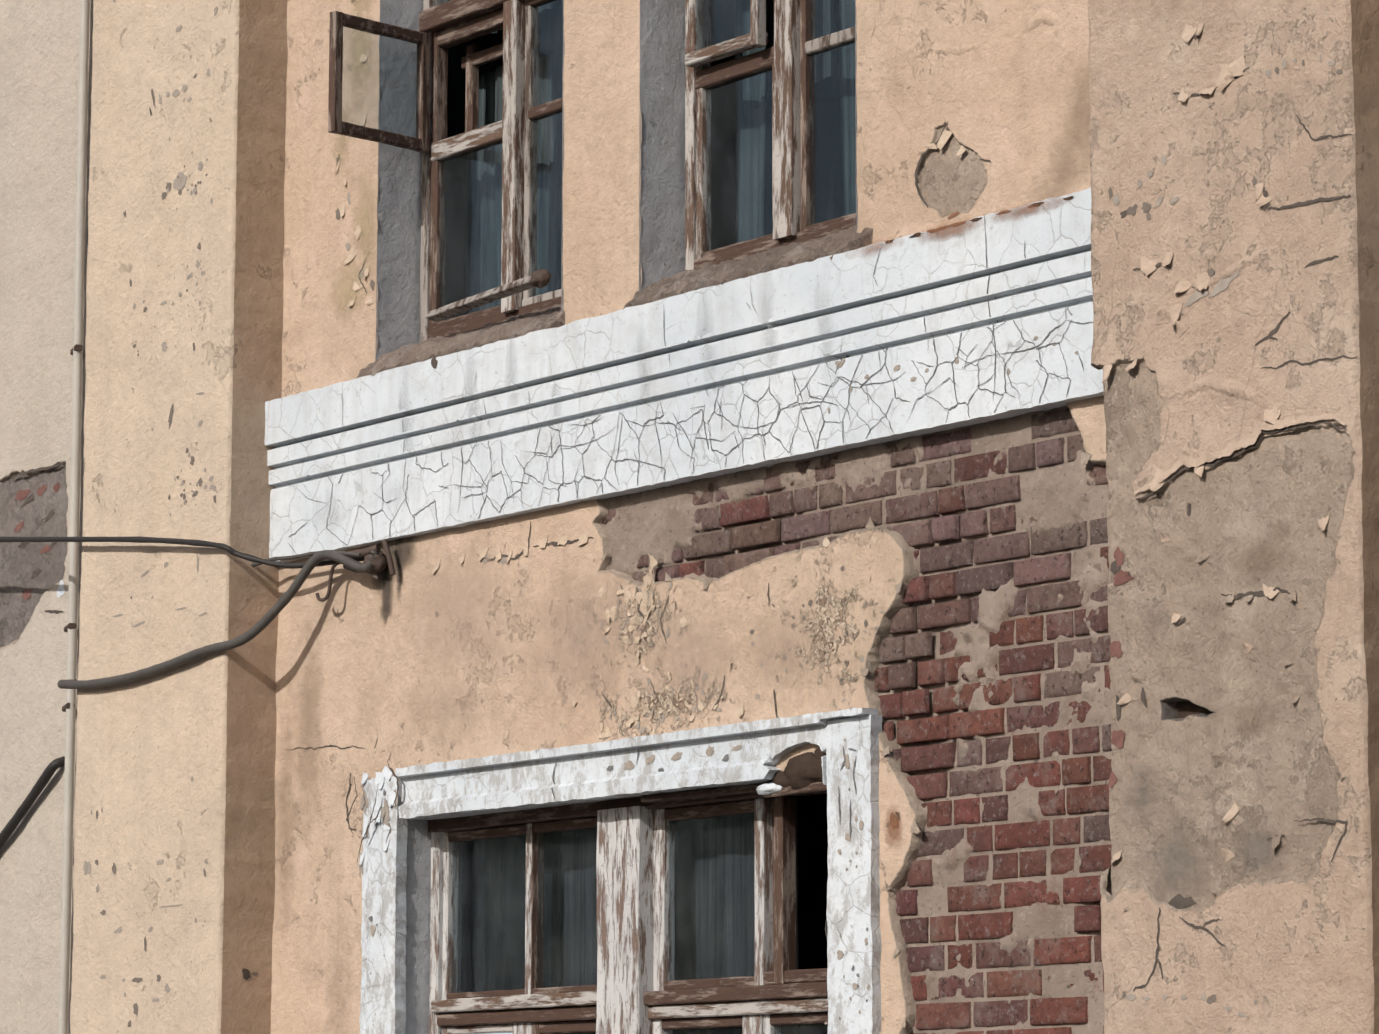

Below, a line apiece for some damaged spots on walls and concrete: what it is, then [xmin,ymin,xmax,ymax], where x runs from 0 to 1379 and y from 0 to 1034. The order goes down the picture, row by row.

peeling [1181,22,1204,43]
peeling [1173,56,1249,102]
crack [1296,115,1352,141]
flaking render [914,121,991,219]
crack [1305,255,1338,268]
crack [1255,312,1357,369]
crack [289,217,1089,553]
flaking render [0,461,68,649]
flaking render [458,350,1355,1034]
crack [286,737,399,862]
crack [1133,908,1225,991]